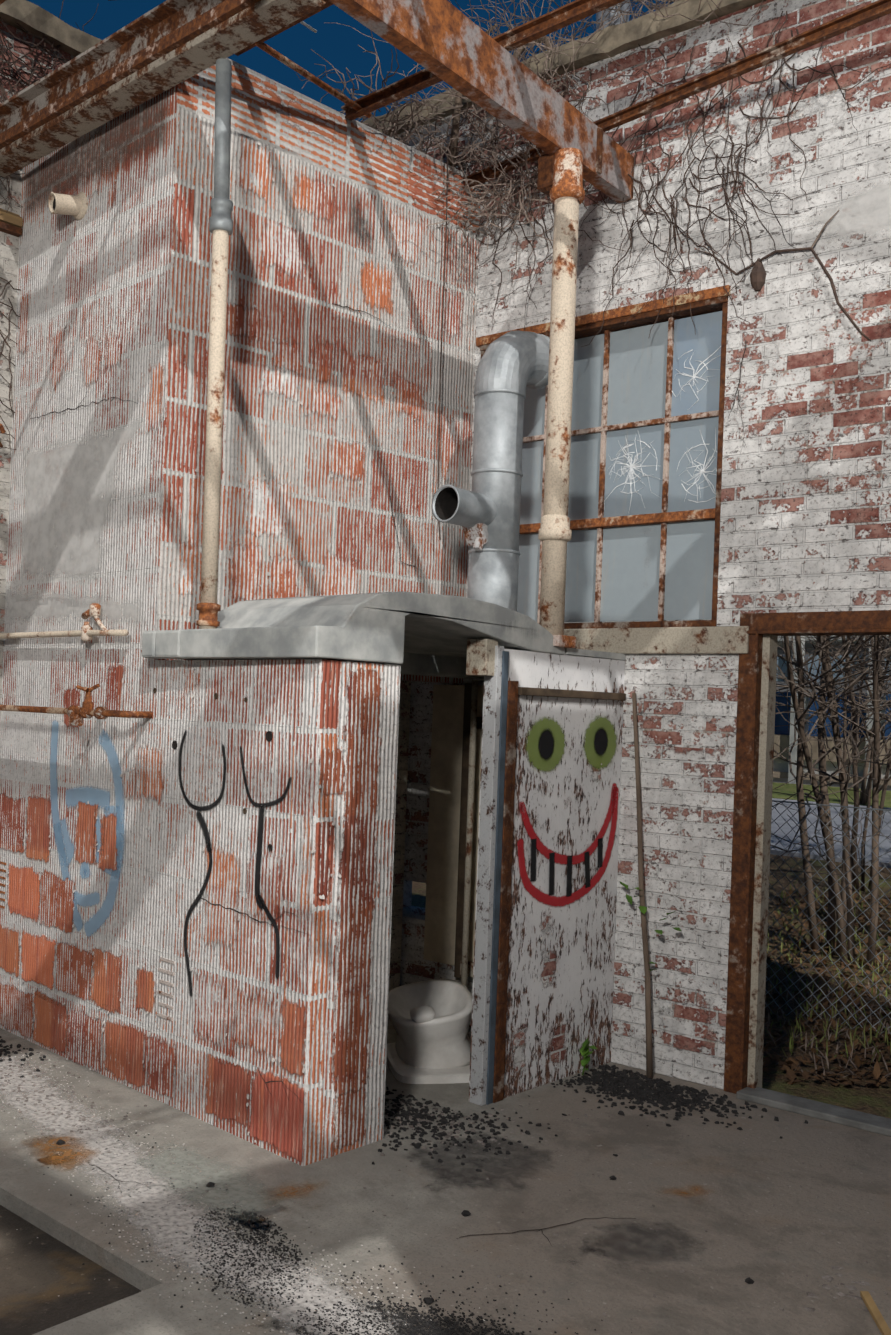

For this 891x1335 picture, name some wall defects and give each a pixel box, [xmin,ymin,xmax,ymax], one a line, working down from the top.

flaking render [675,13,891,176]
peeling [227,303,423,421]
flaking render [734,281,891,494]
peeling [327,438,365,484]
peeling [439,416,463,488]
peeling [178,541,201,598]
peeling [228,475,302,601]
peeling [319,551,359,596]
flaking render [540,913,558,988]
flaking render [548,1021,567,1064]
flaking render [659,1001,715,1053]
crack [459,1217,636,1246]